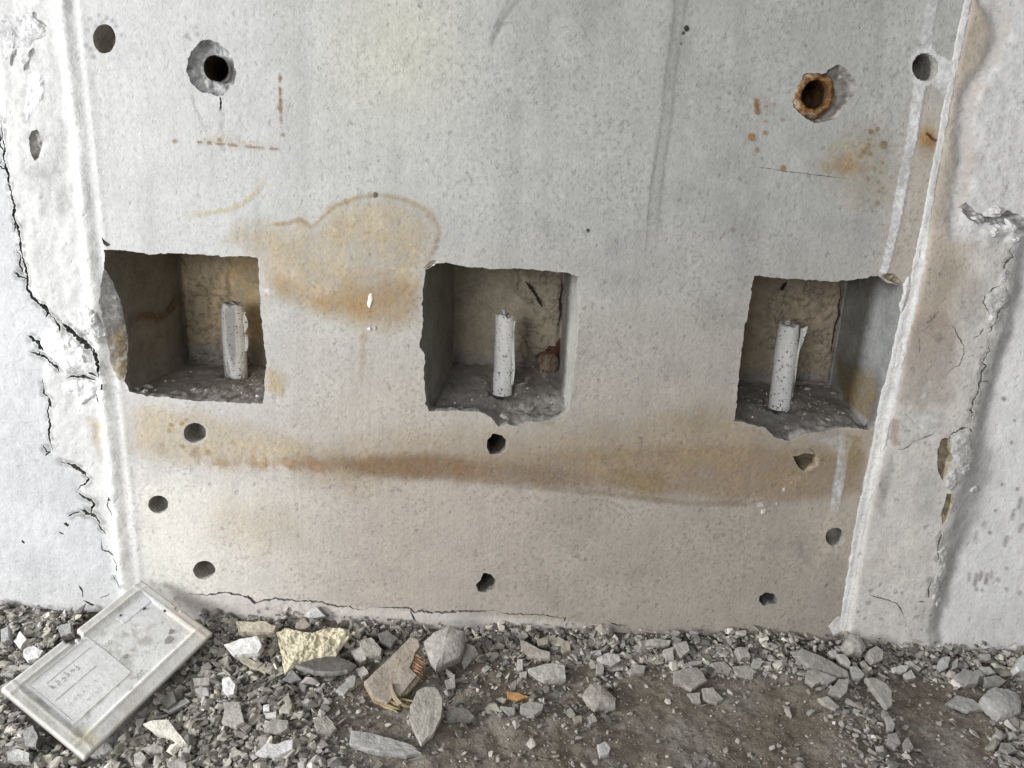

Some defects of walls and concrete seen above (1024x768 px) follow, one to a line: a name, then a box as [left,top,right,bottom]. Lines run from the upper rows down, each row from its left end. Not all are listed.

spalling [957,202,1024,232]
crack [0,117,121,606]
crack [897,246,1014,450]
damp [562,434,858,509]
spalling [937,438,954,481]
spalling [941,494,953,525]
crack [190,592,566,621]
crack [871,531,942,613]